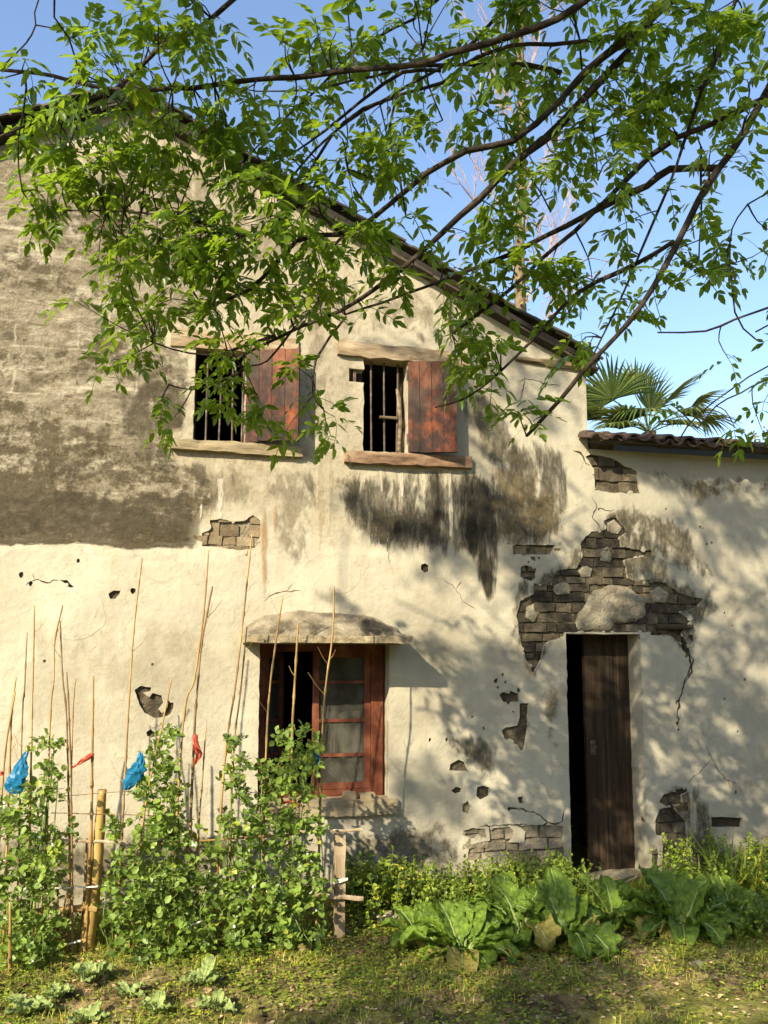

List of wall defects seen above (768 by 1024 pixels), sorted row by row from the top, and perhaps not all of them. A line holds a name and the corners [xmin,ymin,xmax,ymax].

peeling [0,159,261,556]
water stain [123,379,183,471]
water stain [340,395,567,599]
flaking render [586,443,639,495]
flaking render [500,508,703,672]
flaking render [135,686,175,737]
flaking render [494,673,530,750]
crack [676,629,694,726]
flaking render [449,760,467,771]
flaking render [451,786,489,813]
flaking render [462,825,564,868]
flaking render [711,817,740,827]